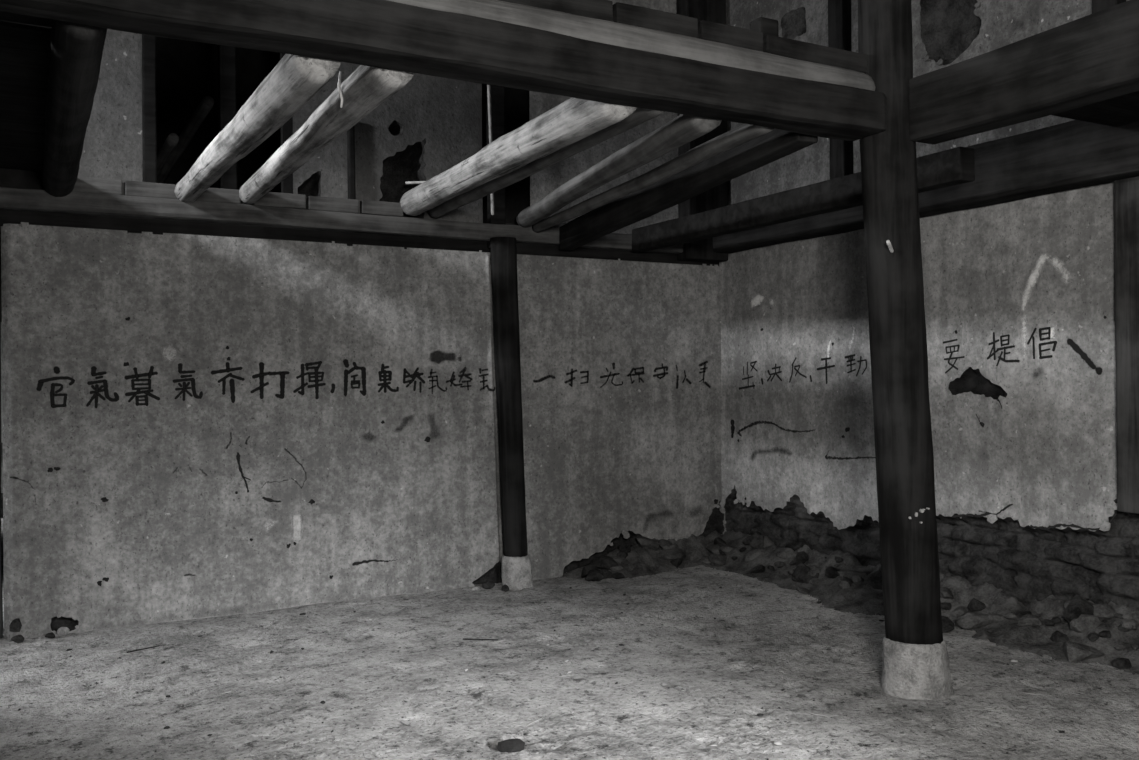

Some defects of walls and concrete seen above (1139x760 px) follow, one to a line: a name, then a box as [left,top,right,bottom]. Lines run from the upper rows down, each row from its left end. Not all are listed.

spalling [920,0,981,66]
spalling [379,120,426,218]
spalling [945,366,1007,403]
spalling [563,530,642,574]
spalling [699,485,881,566]
spalling [936,485,1139,611]